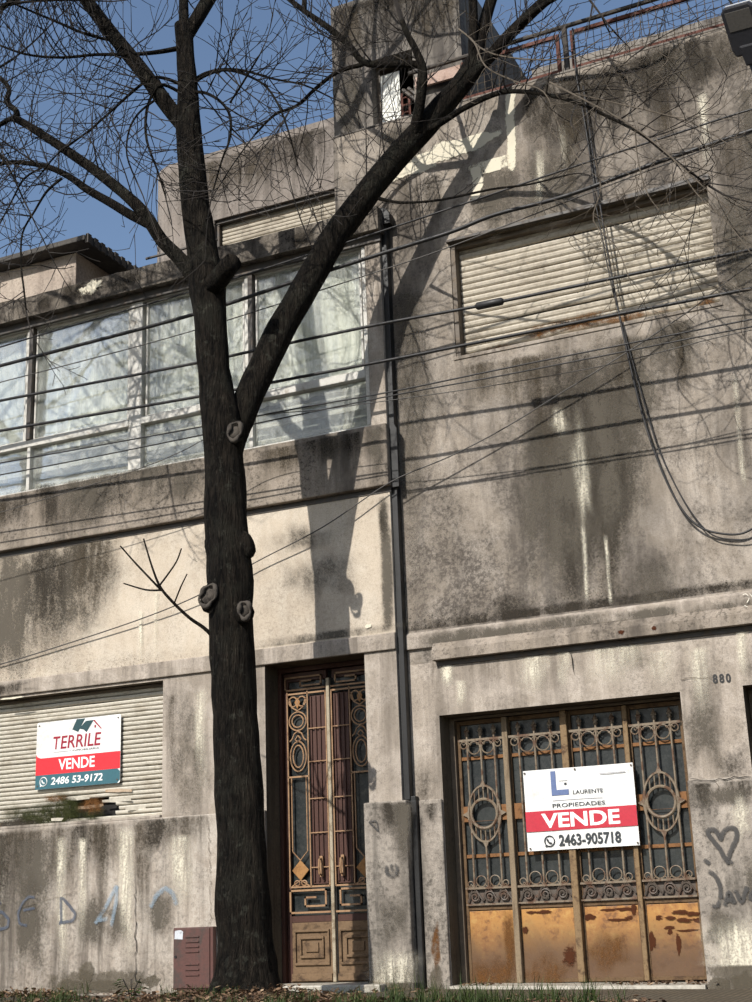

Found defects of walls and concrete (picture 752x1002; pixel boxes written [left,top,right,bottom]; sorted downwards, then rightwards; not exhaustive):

corrosion [529,312,646,337]
water stain [396,295,434,493]
water stain [410,320,752,644]
water stain [0,541,118,694]
water stain [295,629,361,643]
water stain [172,692,203,800]
water stain [0,817,202,959]
corrosion [477,918,528,983]
corrosion [532,946,576,981]
corrosion [585,904,637,922]
corrosion [656,910,700,955]